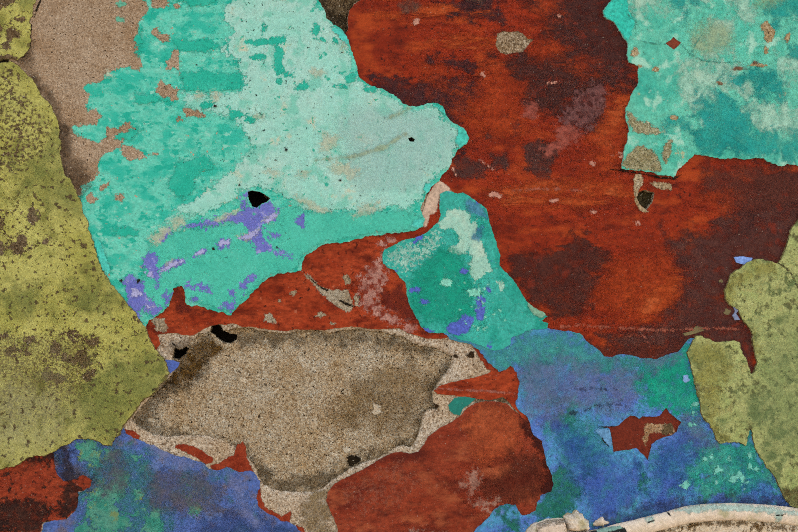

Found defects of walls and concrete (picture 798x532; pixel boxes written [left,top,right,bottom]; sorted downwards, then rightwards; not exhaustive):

crack [0,0,41,62]
flaking render [643,423,664,444]